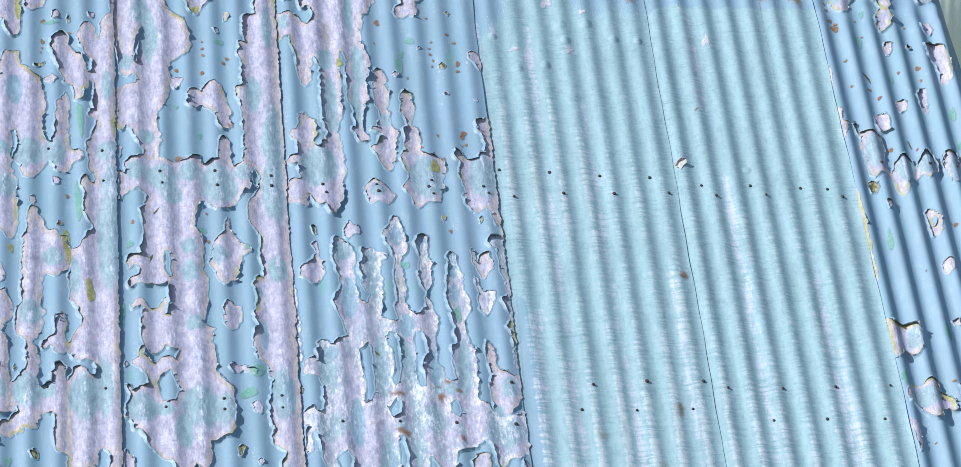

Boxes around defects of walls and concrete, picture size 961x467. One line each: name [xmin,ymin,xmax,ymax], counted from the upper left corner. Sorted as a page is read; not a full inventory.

peeling [823,0,856,13]
peeling [870,0,954,86]
peeling [827,62,961,281]
peeling [0,0,531,467]
peeling [886,317,926,360]
peeling [906,375,961,452]